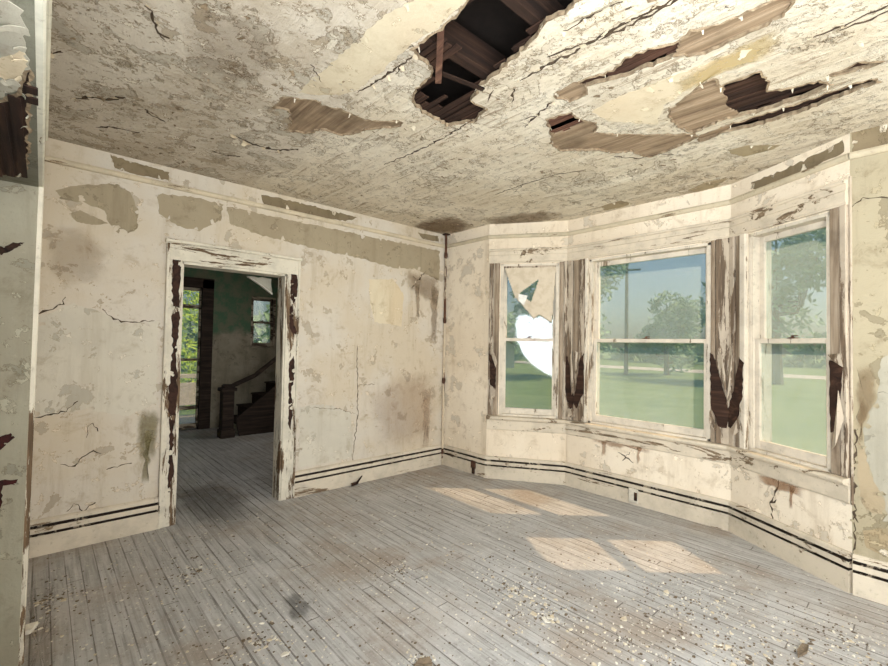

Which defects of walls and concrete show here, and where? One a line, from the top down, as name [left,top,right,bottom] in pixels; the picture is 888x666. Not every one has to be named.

spalling [0,0,38,178]
peeling [63,80,214,181]
peeling [233,0,582,163]
crack [488,0,678,127]
spalling [545,0,884,168]
peeling [51,183,139,236]
peeling [155,178,451,280]
peeling [34,259,183,493]
peeling [0,433,15,450]
peeling [0,479,19,511]
peeling [857,355,888,557]